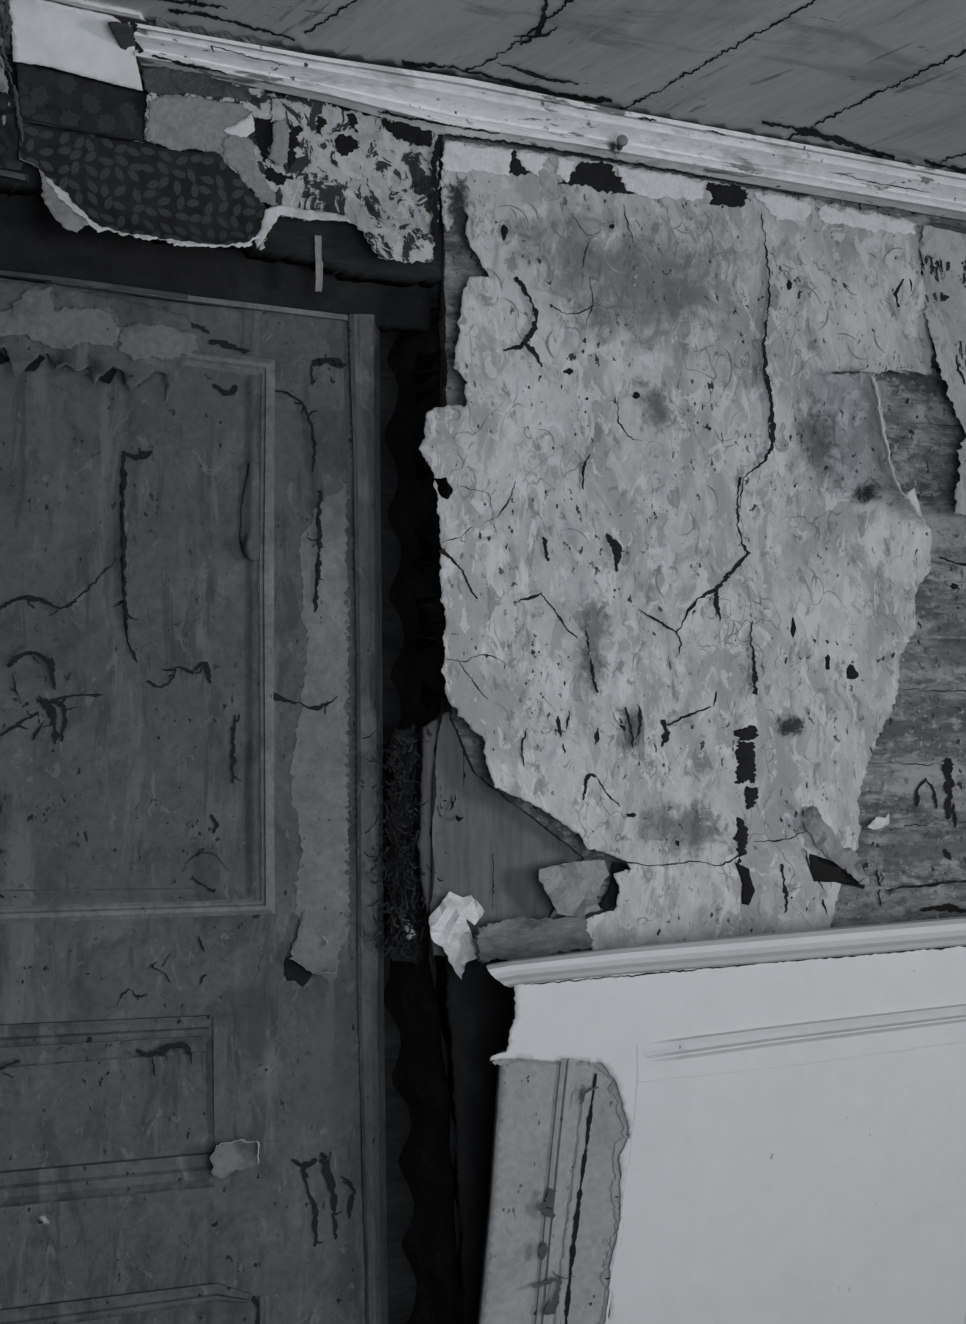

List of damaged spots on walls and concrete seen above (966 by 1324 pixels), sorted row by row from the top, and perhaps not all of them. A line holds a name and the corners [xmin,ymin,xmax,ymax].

peeling [0,56,9,94]
peeling [440,141,966,235]
crack [640,477,751,653]
peeling [867,812,890,830]
spalling [599,862,631,910]
peeling [289,912,337,975]
peeling [210,1139,259,1180]